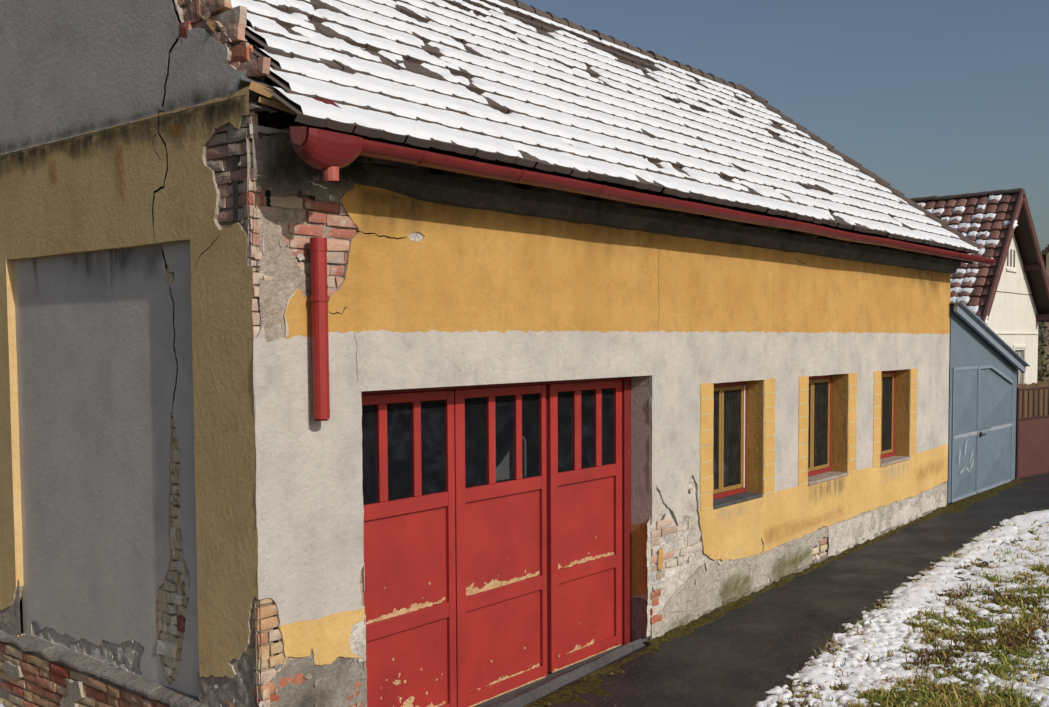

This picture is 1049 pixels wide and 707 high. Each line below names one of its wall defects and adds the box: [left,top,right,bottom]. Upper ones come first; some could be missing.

spalling [177,0,271,78]
leakage [0,95,243,164]
crack [152,0,183,417]
spalling [205,111,357,343]
peeling [0,580,144,674]
spalling [157,417,190,683]
peeling [197,571,446,707]
peeling [466,570,540,596]
peeling [469,631,621,707]
peeling [558,552,614,569]
spalling [647,476,722,637]